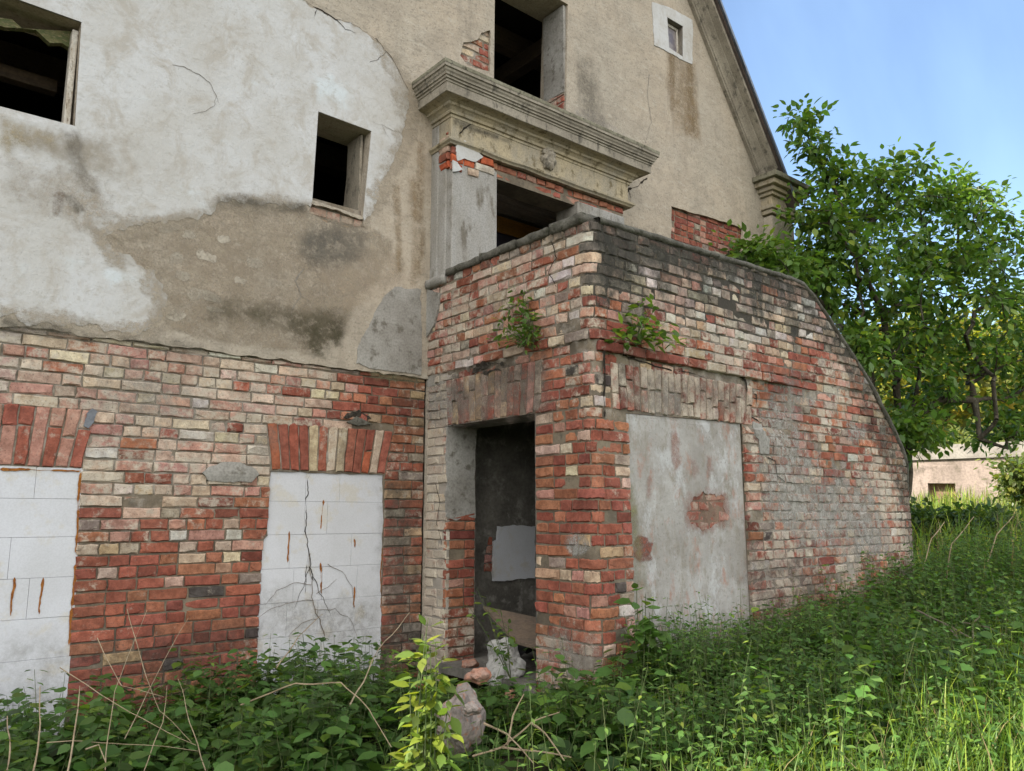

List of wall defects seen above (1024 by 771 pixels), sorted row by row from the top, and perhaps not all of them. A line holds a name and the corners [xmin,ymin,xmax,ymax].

crack [306,1,409,90]
spalling [460,32,489,71]
spalling [439,132,623,214]
spalling [671,207,741,254]
flaking render [687,492,729,532]
crack [296,479,331,615]
spalling [634,536,653,561]